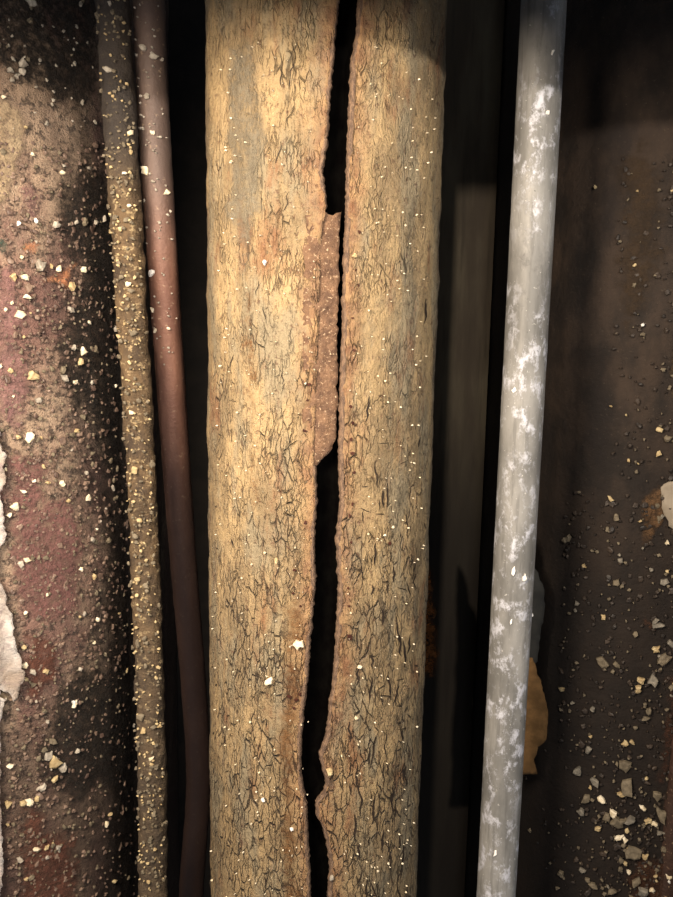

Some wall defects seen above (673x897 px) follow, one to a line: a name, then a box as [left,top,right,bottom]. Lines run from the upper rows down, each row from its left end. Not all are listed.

peeling [0,18,42,82]
peeling [25,0,89,66]
crack [271,0,421,897]
peeling [0,141,137,897]
crack [233,627,281,676]
crack [222,705,267,786]